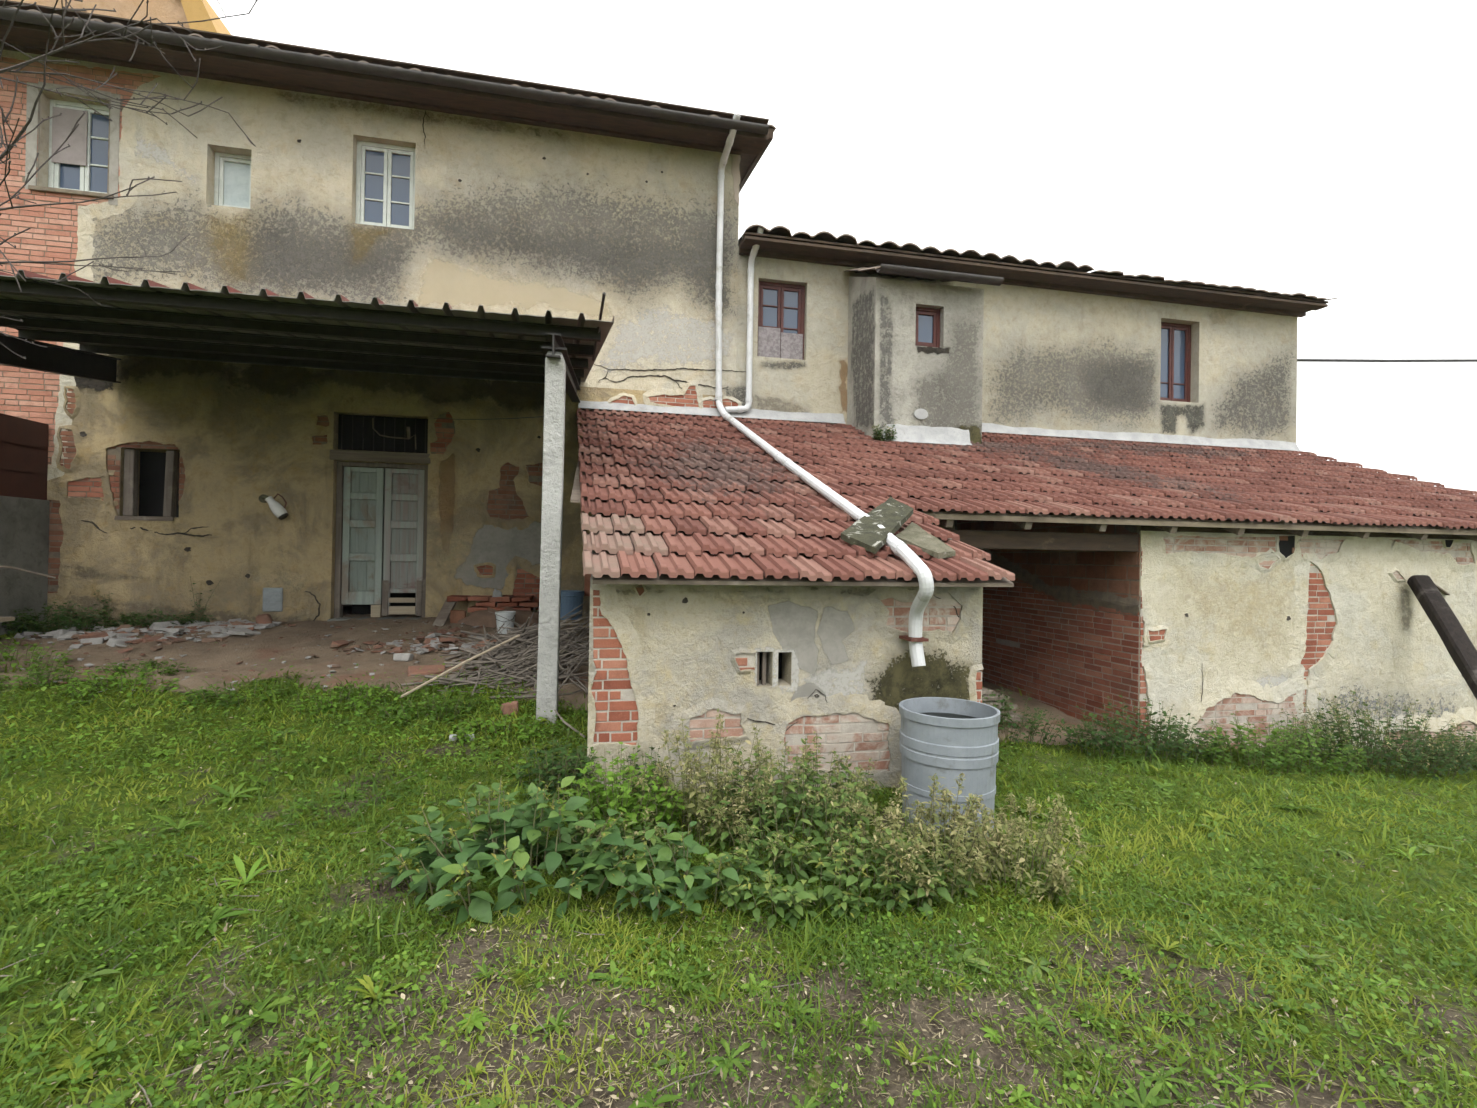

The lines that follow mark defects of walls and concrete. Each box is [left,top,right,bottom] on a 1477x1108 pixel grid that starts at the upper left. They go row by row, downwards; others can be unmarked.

flaking render [0,50,176,281]
flaking render [0,326,79,350]
water stain [91,139,746,372]
crack [594,364,746,389]
spalling [607,380,742,415]
water stain [851,291,893,430]
water stain [912,317,1297,440]
spalling [0,365,202,602]
flaking render [455,447,543,612]
spalling [587,580,902,791]
flaking render [866,520,1348,747]
spalling [1388,539,1477,583]